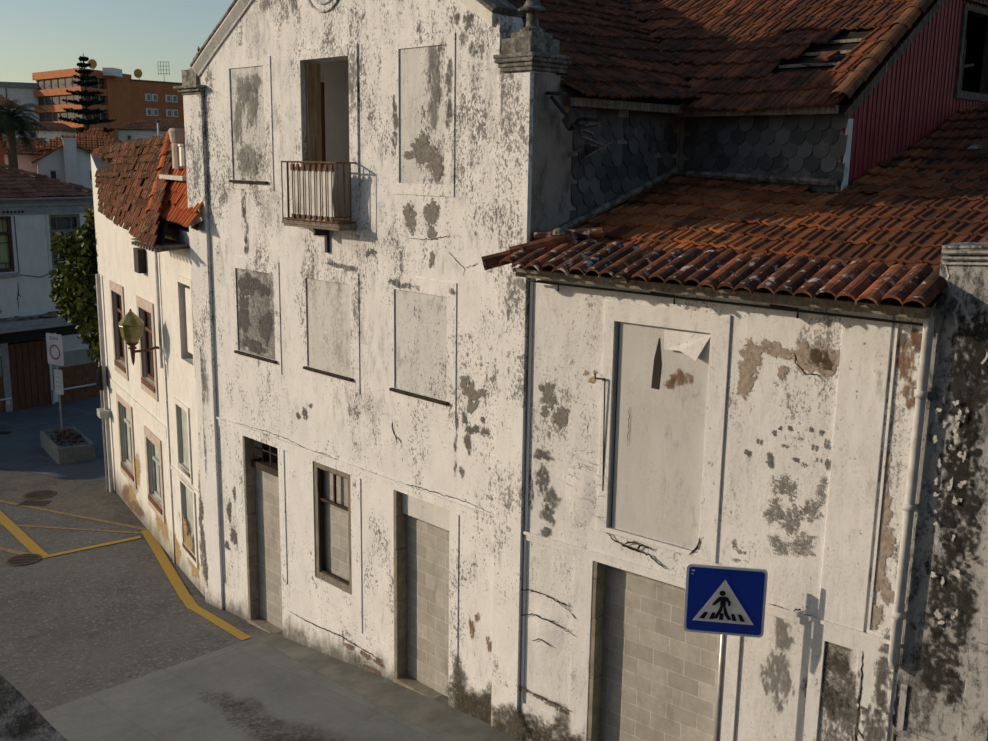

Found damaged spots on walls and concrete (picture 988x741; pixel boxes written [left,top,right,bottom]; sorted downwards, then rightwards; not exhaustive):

flaking render [404,130,444,183]
flaking render [403,197,440,269]
flaking render [736,337,840,401]
flaking render [459,375,489,455]
flaking render [762,425,830,558]
water stain [915,301,988,713]
crack [521,589,576,647]
water stain [447,655,581,741]
water stain [760,616,794,712]
water stain [813,629,893,741]
crack [854,651,864,741]
crack [891,679,899,741]